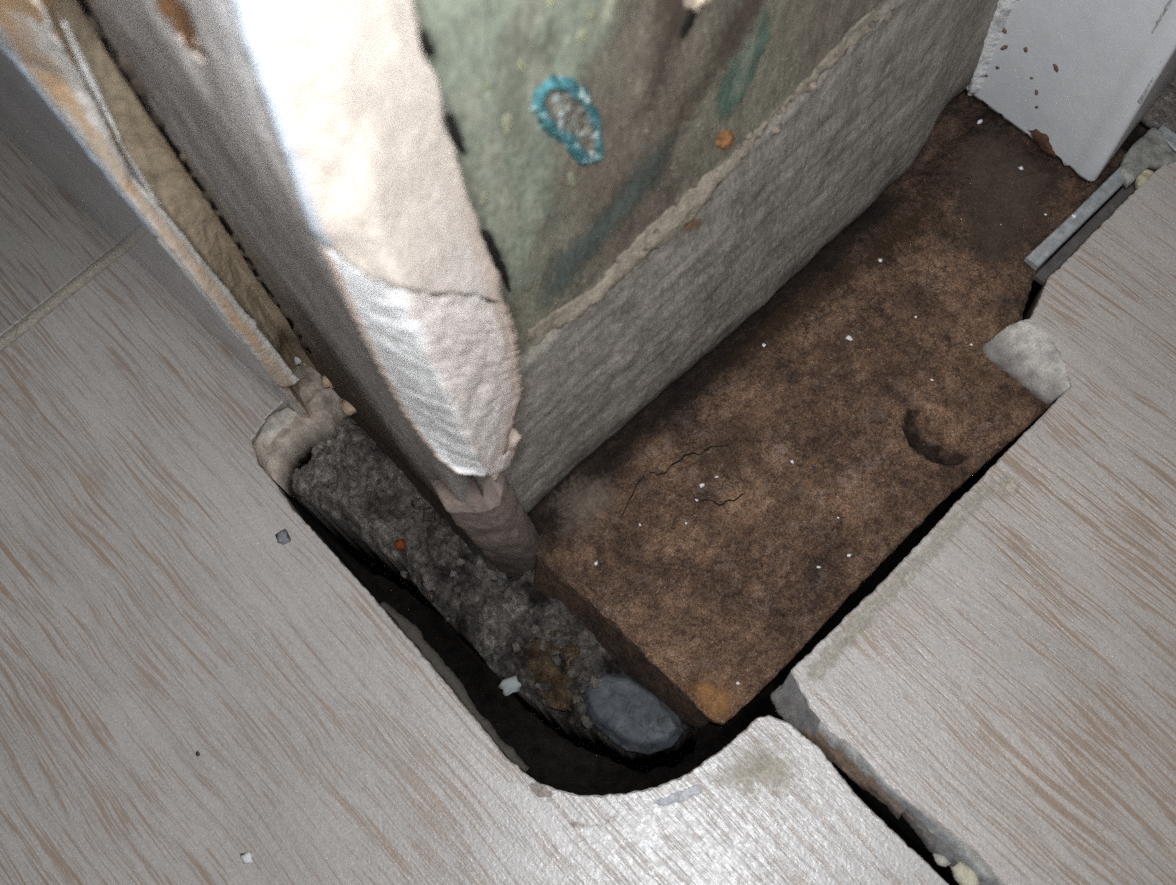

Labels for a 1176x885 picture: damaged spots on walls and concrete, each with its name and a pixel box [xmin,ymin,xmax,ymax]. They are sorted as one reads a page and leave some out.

peeling [0,0,301,388]
crack [77,0,312,354]
spalling [227,0,895,579]
peeling [1151,0,1173,33]